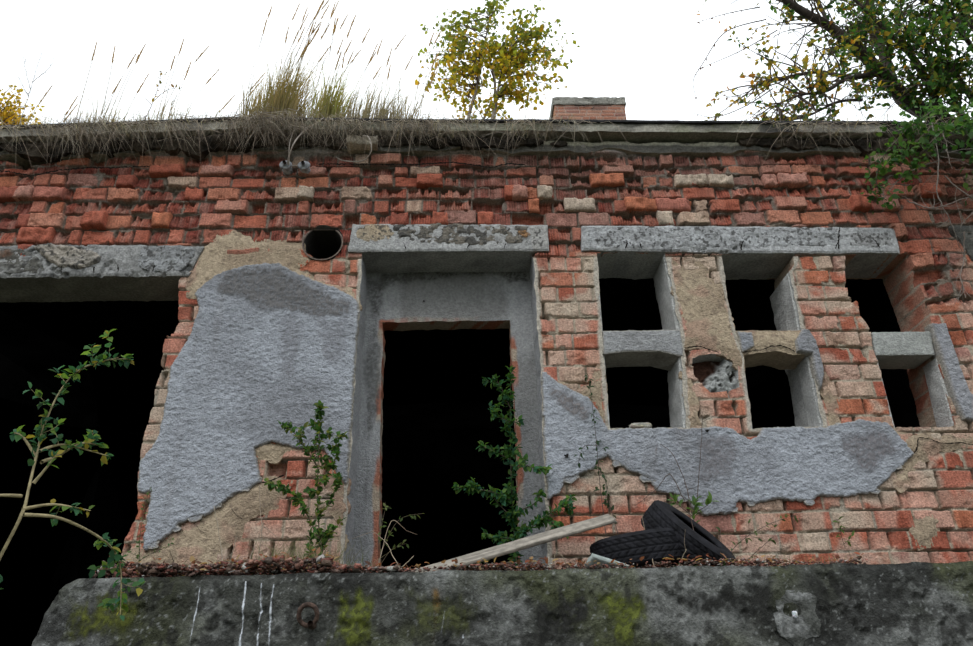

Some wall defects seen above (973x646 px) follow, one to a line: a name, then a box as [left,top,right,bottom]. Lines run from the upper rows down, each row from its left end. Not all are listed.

spalling [0,185,67,203]
spalling [151,212,173,229]
spalling [148,164,204,201]
spalling [200,165,235,178]
spalling [297,166,327,202]
spalling [356,211,548,250]
spalling [504,184,553,214]
spalling [564,172,838,248]
peeling [122,230,363,568]
peeling [540,323,973,516]
peeling [907,515,940,552]
water stain [688,586,771,615]